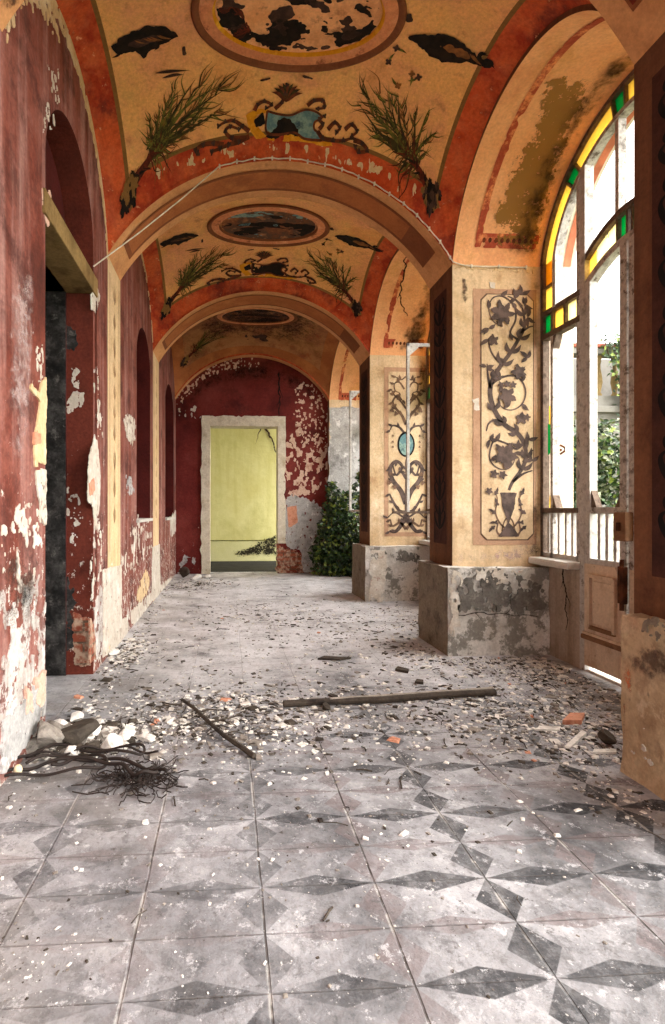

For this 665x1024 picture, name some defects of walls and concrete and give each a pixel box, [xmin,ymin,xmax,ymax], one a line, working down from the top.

crack [397,257,408,316]
peeling [178,358,259,419]
crack [255,372,283,453]
peeling [66,368,196,667]
spalling [275,382,328,573]
peeling [0,345,47,774]
crack [561,569,570,628]